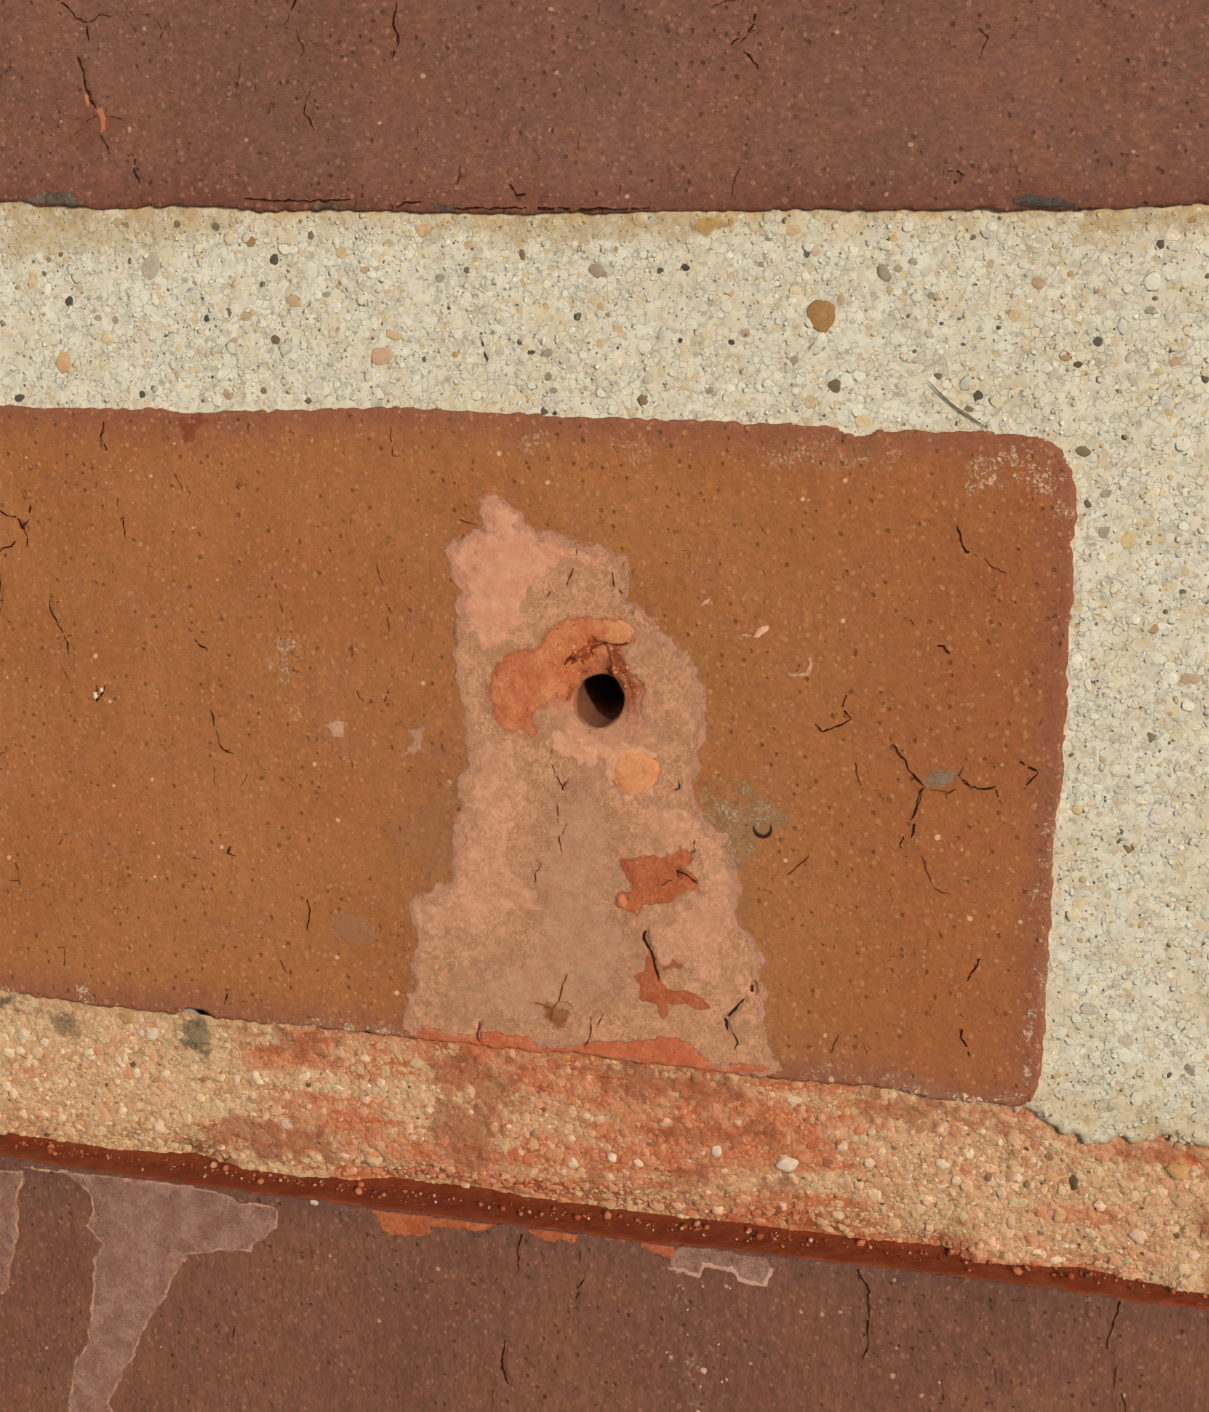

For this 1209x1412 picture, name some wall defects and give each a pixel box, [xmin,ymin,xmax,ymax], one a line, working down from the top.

crack [283,0,318,57]
crack [62,2,140,183]
peeling [570,619,635,665]
peeling [742,625,769,638]
crack [815,695,851,732]
peeling [615,752,661,796]
crack [892,744,1038,894]
peeling [662,960,684,971]